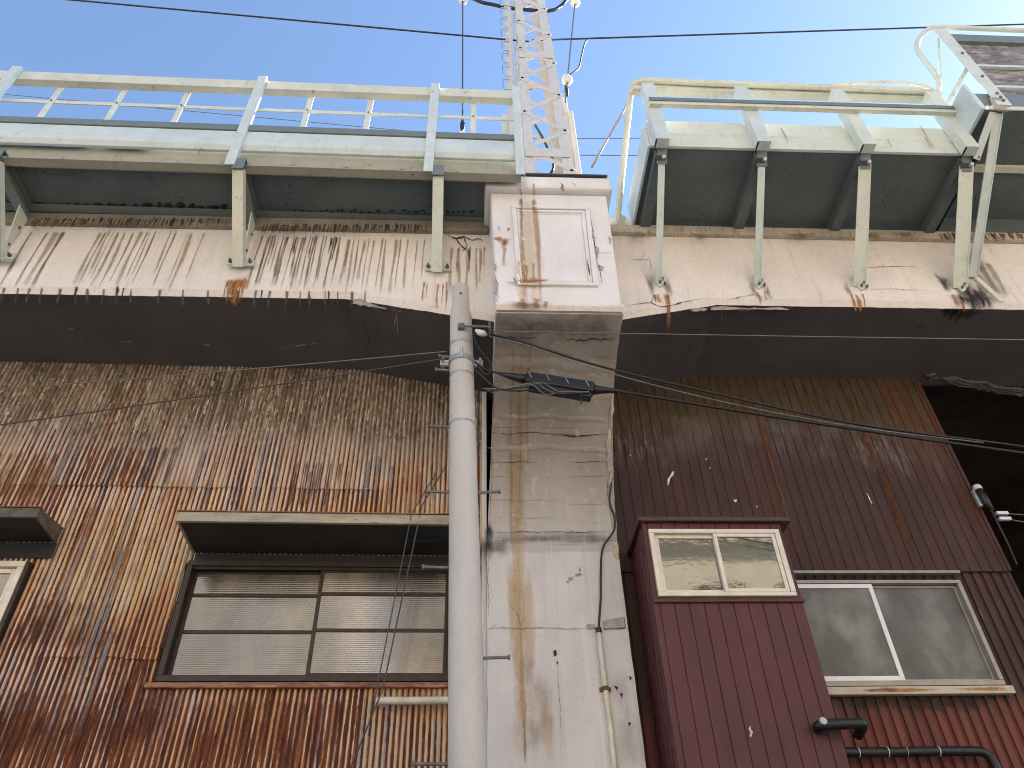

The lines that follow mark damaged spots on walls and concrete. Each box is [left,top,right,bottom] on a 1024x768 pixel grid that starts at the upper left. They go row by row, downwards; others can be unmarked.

water stain [1,217,230,301]
rust [223,279,246,302]
water stain [249,224,427,306]
crack [448,235,481,256]
rust [494,184,542,286]
crack [633,296,716,350]
water stain [939,278,990,321]
rust [101,447,177,482]
crack [490,395,612,533]
rust [46,507,142,583]
crack [488,557,595,630]
rust [185,702,341,752]